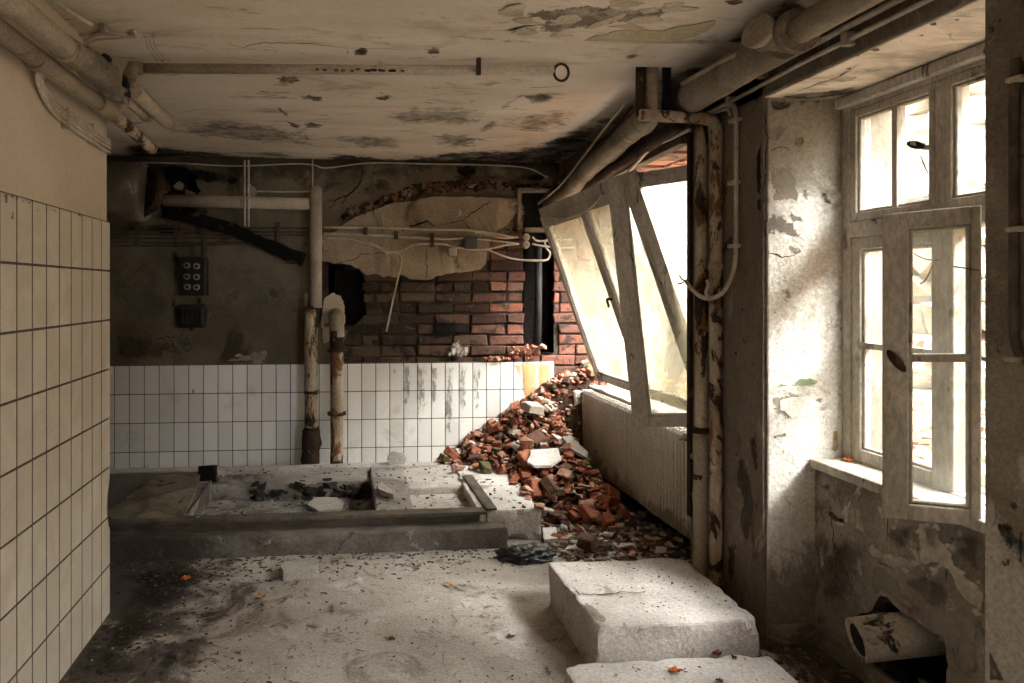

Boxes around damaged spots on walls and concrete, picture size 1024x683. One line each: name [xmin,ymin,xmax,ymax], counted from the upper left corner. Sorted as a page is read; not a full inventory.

peeling [498,0,715,42]
spalling [159,165,201,218]
crack [330,164,363,208]
peeling [756,146,803,254]
flaking render [318,179,631,553]
damp [404,366,480,427]
peeling [728,433,758,580]
spalling [858,596,899,620]
spalling [874,655,948,683]